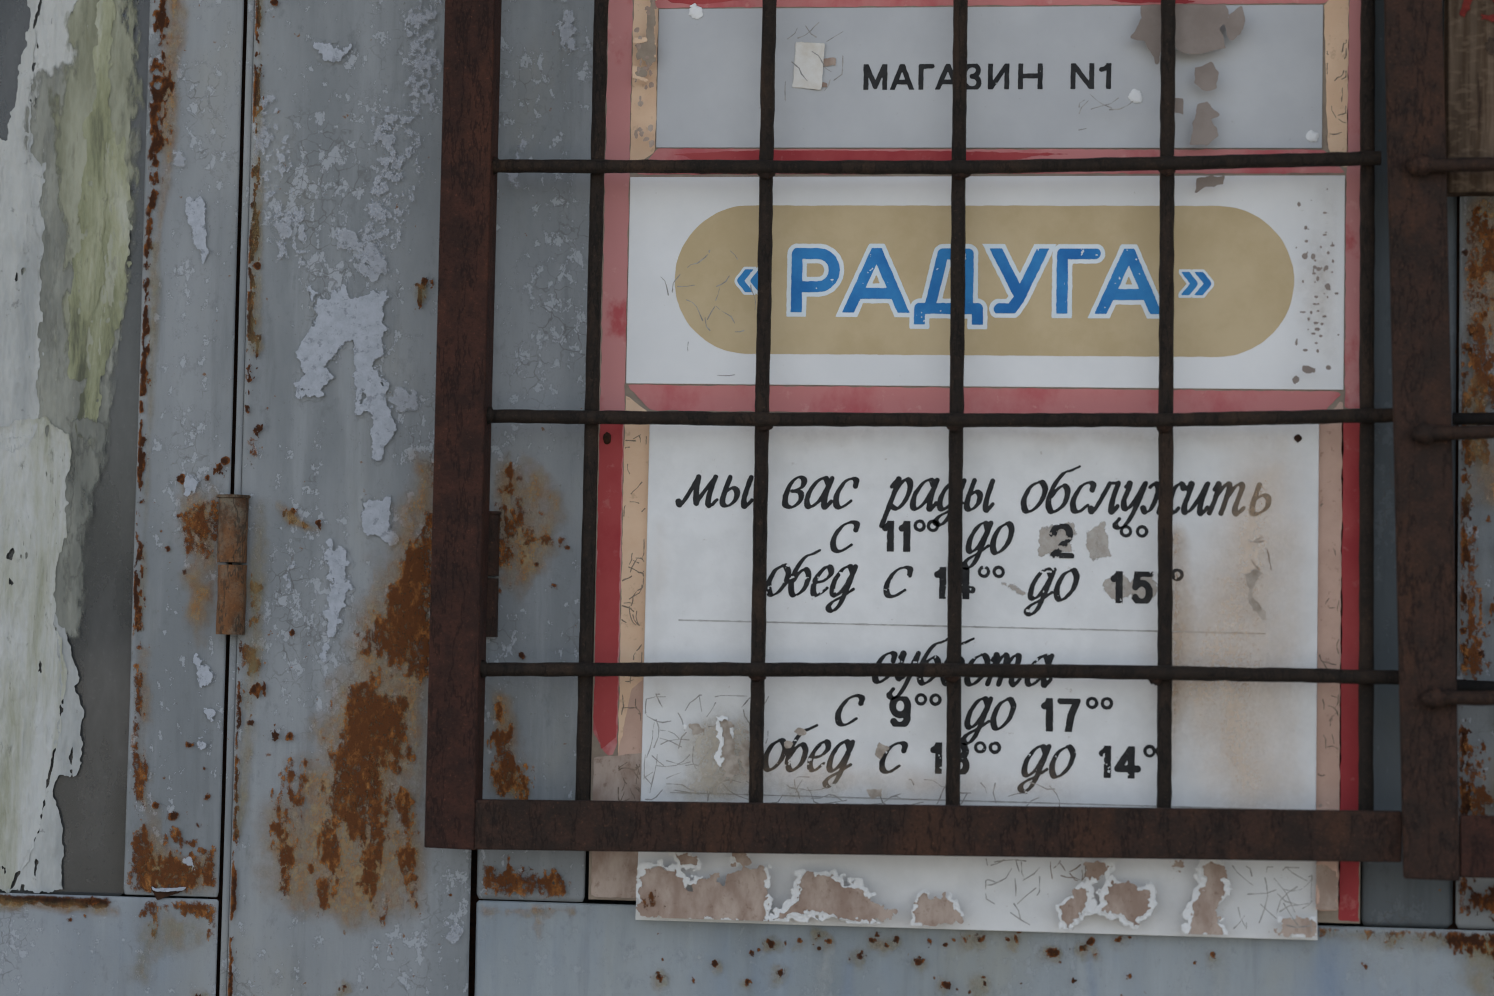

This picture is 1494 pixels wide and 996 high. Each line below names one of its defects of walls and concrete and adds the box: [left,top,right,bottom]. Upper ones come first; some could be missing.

corrosion [252,0,278,134]
peeling [251,95,309,268]
peeling [292,0,442,466]
peeling [0,0,142,893]
corrosion [127,0,268,996]
corrosion [495,462,570,582]
corrosion [1459,199,1494,680]
corrosion [267,463,433,925]
corrosion [487,695,535,800]
corrosion [1459,720,1494,816]
corrosion [0,894,111,922]
corrosion [1357,877,1494,990]